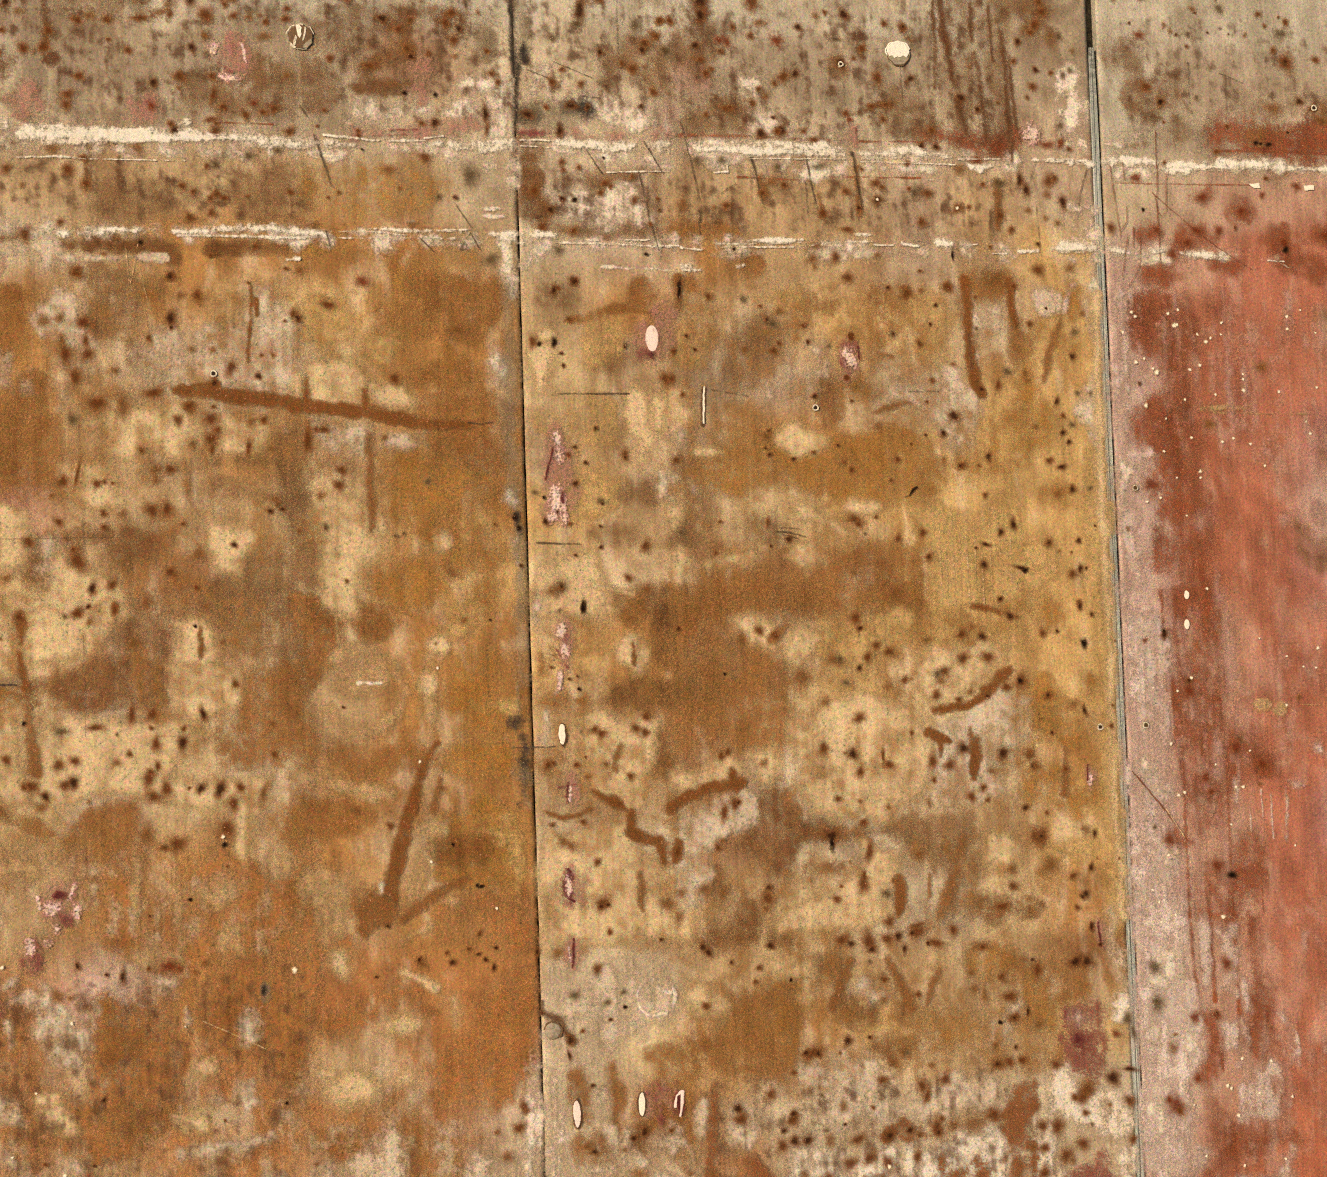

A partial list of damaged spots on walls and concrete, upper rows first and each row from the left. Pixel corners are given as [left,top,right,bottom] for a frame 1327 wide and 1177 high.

corrosion [0,129,476,385]
peeling [1,63,702,300]
corrosion [0,0,1073,279]
peeling [718,233,977,267]
corrosion [1104,21,1198,141]
corrosion [1255,11,1292,71]
corrosion [0,243,1137,1177]
corrosion [1167,1096,1186,1115]